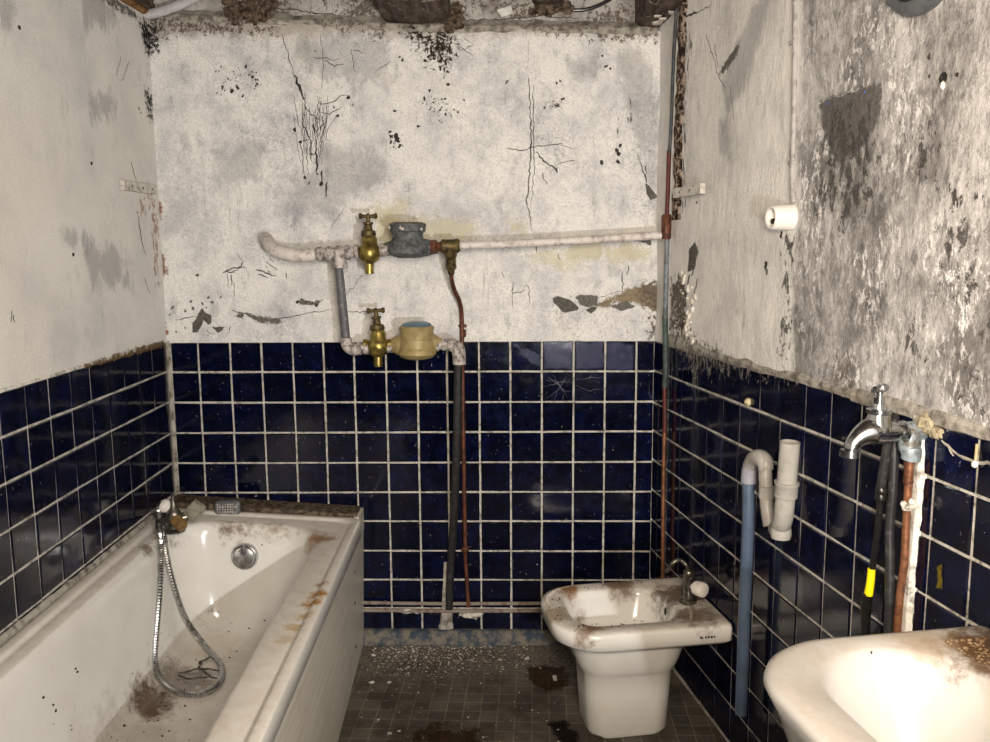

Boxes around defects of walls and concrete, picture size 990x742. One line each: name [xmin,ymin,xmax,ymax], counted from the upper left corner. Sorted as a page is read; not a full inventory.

peeling [652,11,675,26]
crack [508,78,575,253]
water stain [813,94,894,237]
water stain [903,120,990,306]
spalling [169,295,281,334]
spalling [552,294,598,314]
spalling [612,301,635,311]
water stain [901,323,934,403]
crack [544,376,602,396]
water stain [938,362,988,416]
water stain [548,720,579,742]